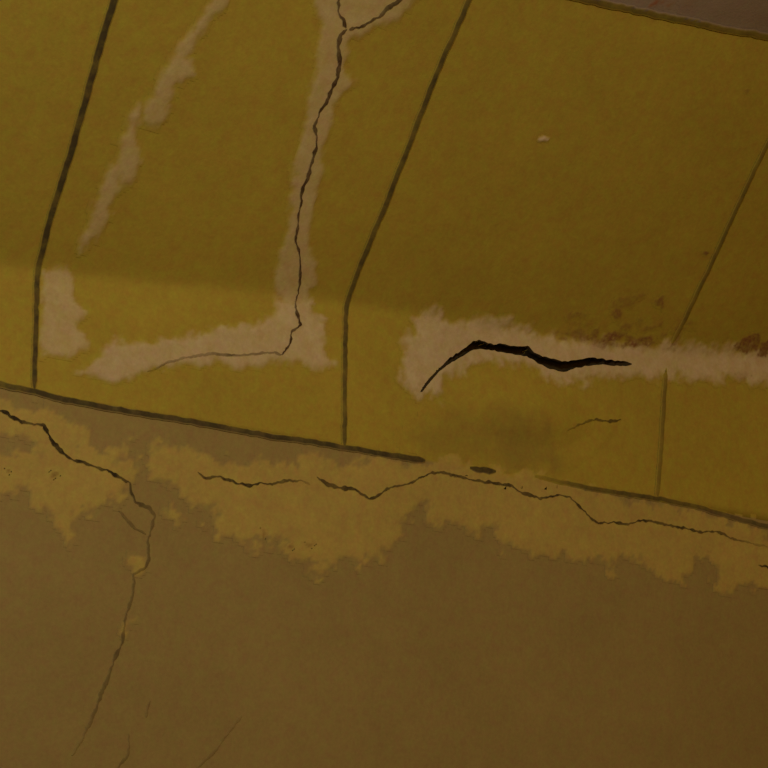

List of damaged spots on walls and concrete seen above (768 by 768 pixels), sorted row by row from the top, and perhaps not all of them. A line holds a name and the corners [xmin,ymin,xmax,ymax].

damp [71,0,421,386]
crack [148,0,402,371]
crack [420,340,632,392]
damp [519,327,768,393]
damp [394,389,570,489]
crack [198,471,768,568]
crack [0,409,156,756]